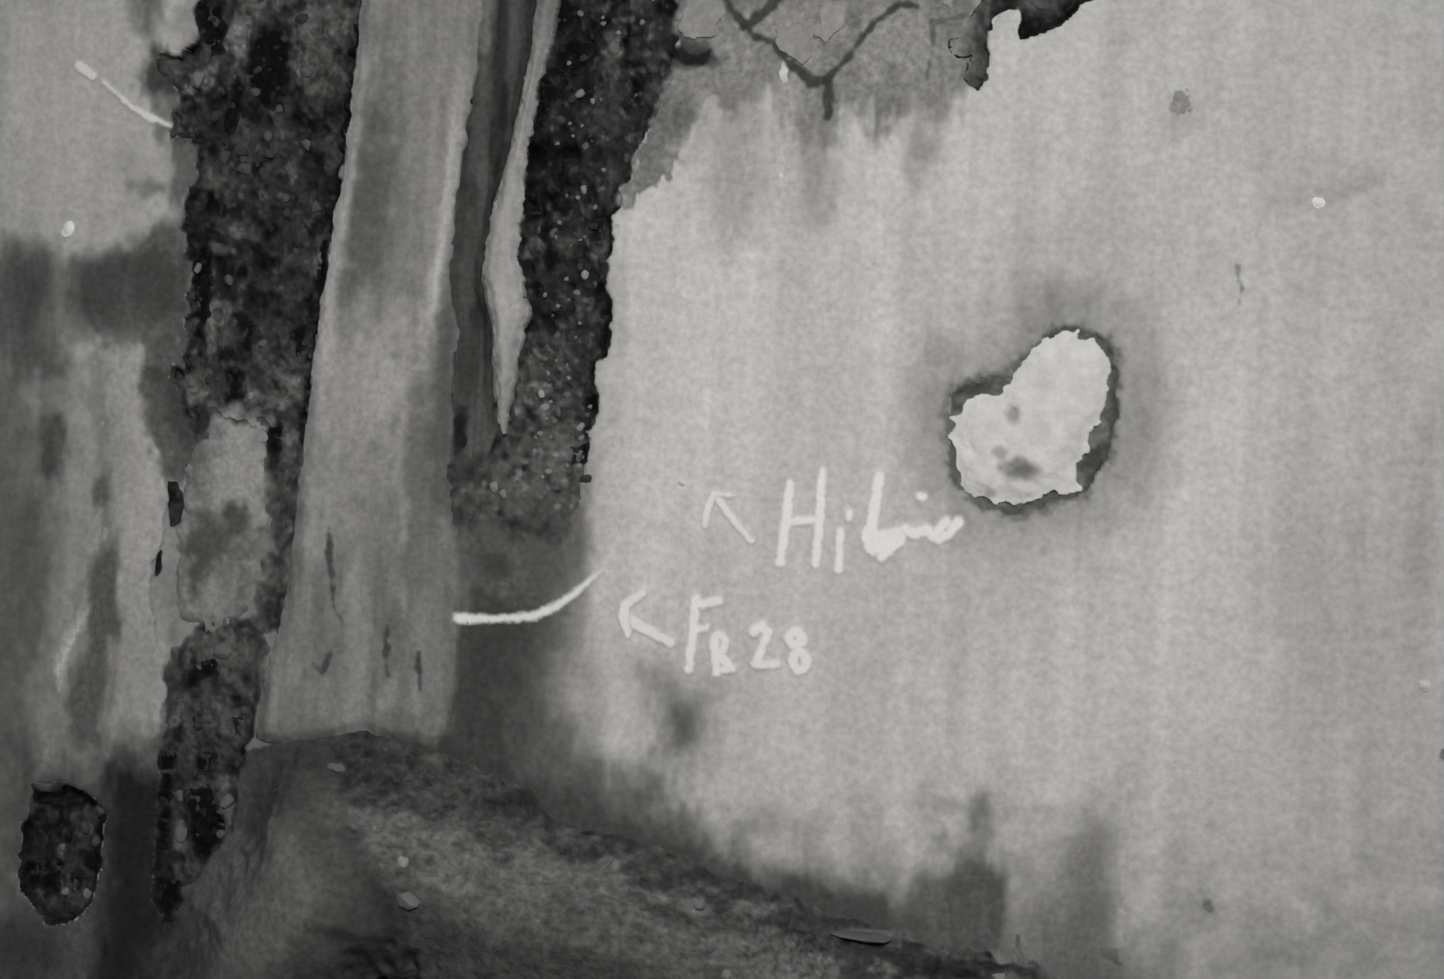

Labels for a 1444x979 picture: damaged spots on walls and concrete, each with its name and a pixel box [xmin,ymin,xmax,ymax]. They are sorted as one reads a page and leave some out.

crack [661,33,711,64]
crack [725,0,966,120]
leakage [0,211,190,375]
spalling [447,0,1090,532]